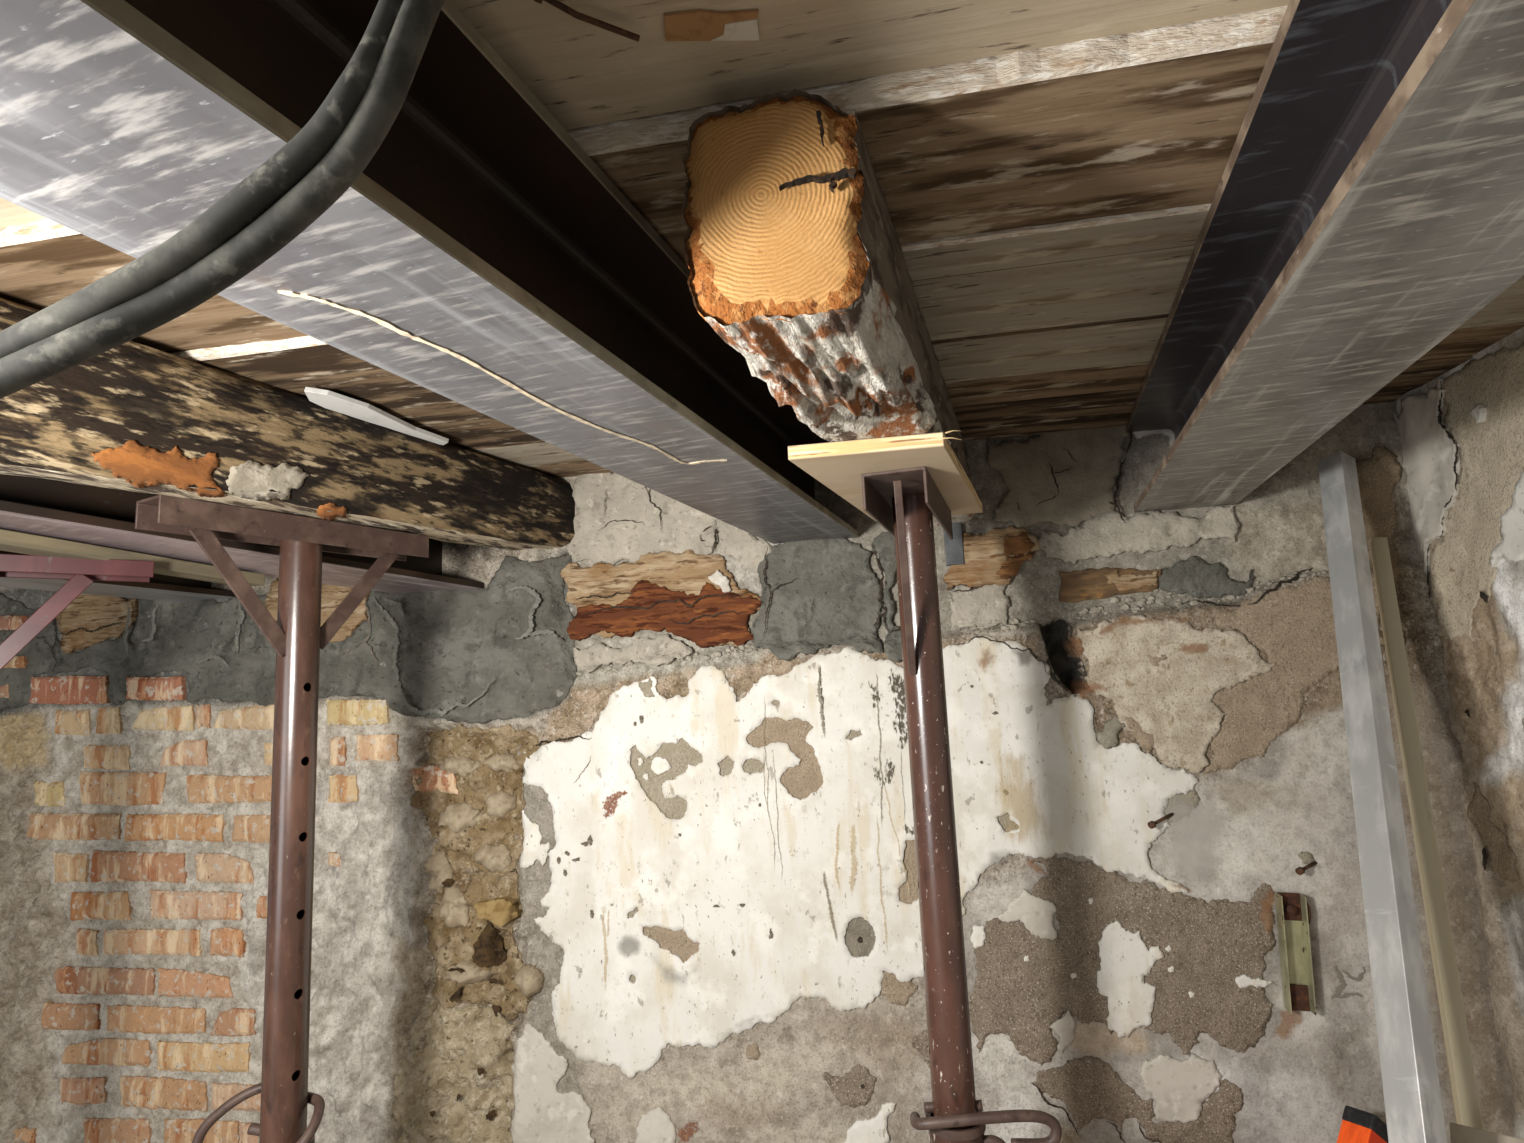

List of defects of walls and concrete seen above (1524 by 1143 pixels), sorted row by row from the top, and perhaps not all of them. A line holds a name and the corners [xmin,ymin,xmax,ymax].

flaking render [0,615,28,630]
flaking render [0,656,274,1143]
flaking render [326,699,459,803]
flaking render [510,647,924,1143]
spalling [943,576,1339,1143]
spalling [1356,342,1524,645]
crack [1427,384,1458,600]
spalling [1467,783,1519,882]